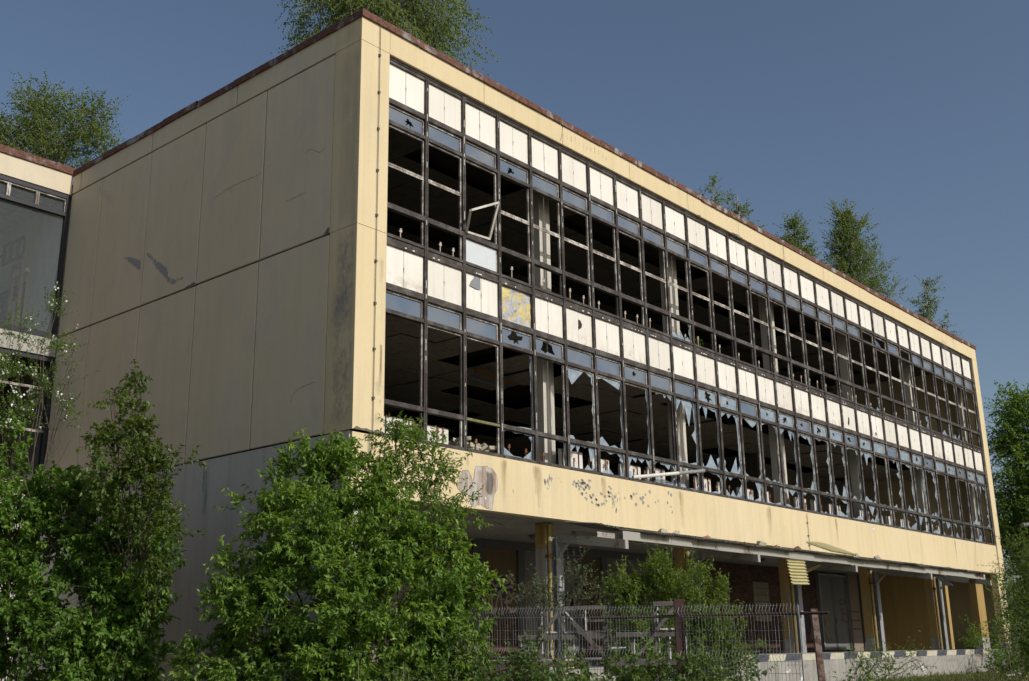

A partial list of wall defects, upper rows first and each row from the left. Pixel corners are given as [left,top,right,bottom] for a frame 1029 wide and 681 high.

peeling [544,474,673,514]